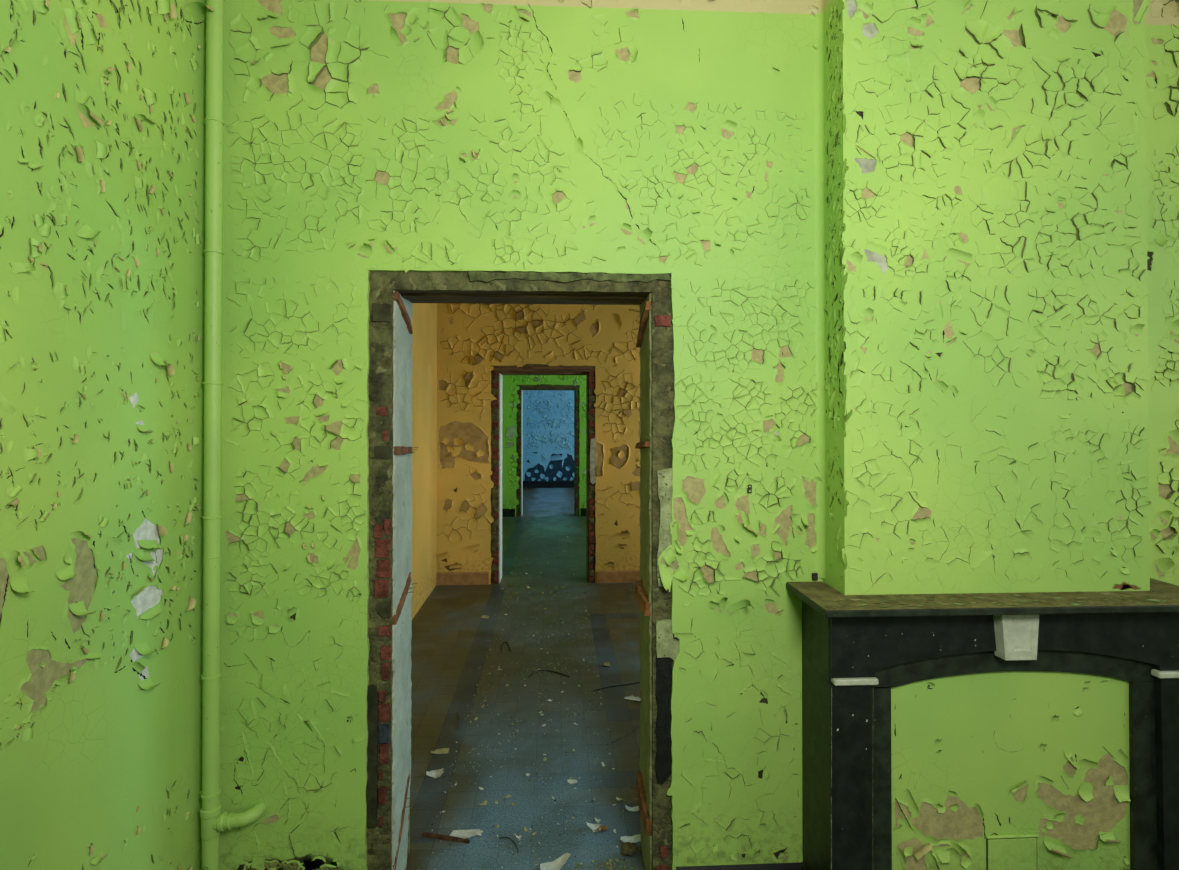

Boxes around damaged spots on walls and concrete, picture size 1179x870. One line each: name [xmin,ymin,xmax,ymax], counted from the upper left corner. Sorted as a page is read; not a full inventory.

peeling [224,0,564,206]
crack [528,4,662,252]
peeling [344,236,397,261]
peeling [616,200,653,252]
peeling [0,0,214,751]
peeling [892,774,1012,870]
peeling [1009,749,1131,870]